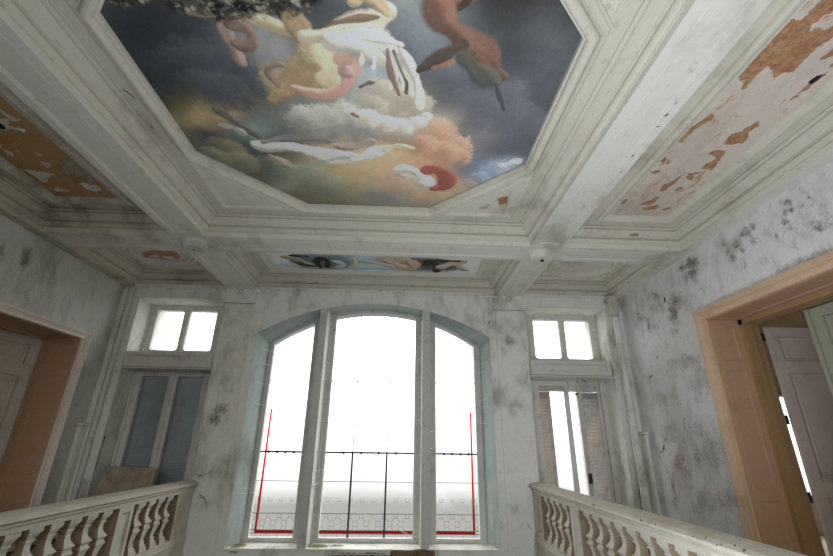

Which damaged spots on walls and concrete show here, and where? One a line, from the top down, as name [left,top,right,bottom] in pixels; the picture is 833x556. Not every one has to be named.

peeling [739,0,833,100]
peeling [0,109,27,133]
peeling [679,114,714,143]
peeling [25,153,69,192]
peeling [640,121,759,211]
peeling [142,250,181,261]